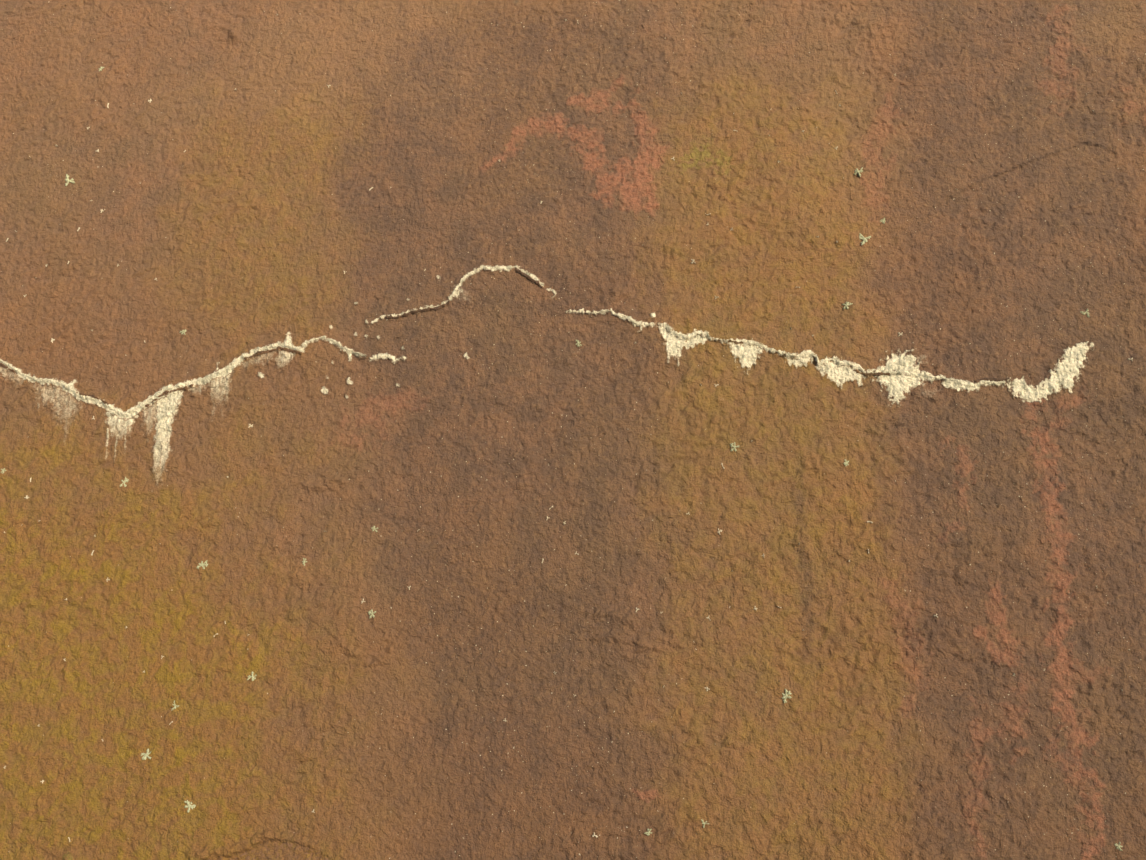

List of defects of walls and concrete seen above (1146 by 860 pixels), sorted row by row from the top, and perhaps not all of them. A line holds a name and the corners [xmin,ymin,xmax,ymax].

crack [0,264,1096,490]
leakage [867,0,1146,860]
corrosion [952,380,1115,860]